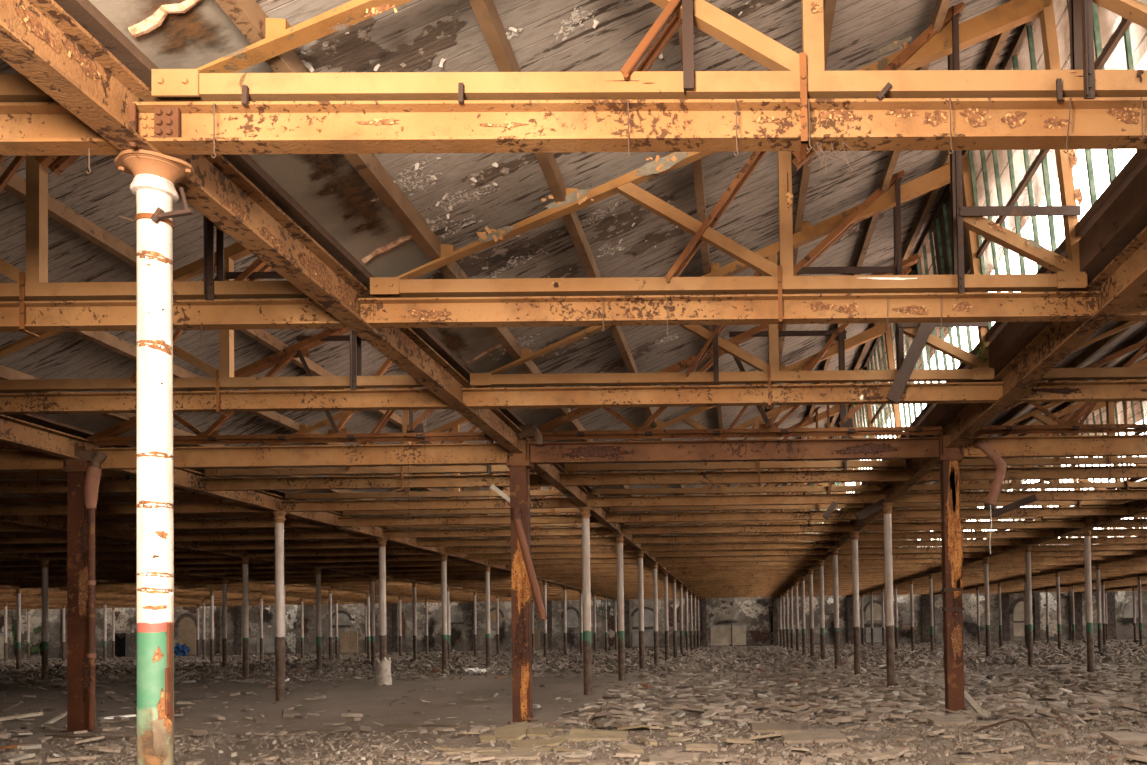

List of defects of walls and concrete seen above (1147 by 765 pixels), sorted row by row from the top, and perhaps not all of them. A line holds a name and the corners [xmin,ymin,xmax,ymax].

peeling [300,4,467,73]
water stain [297,154,384,233]
peeling [393,157,442,196]
peeling [426,153,568,278]
rust [79,513,90,616]
rust [945,460,963,662]
rust [511,540,531,721]
rust [157,689,173,733]